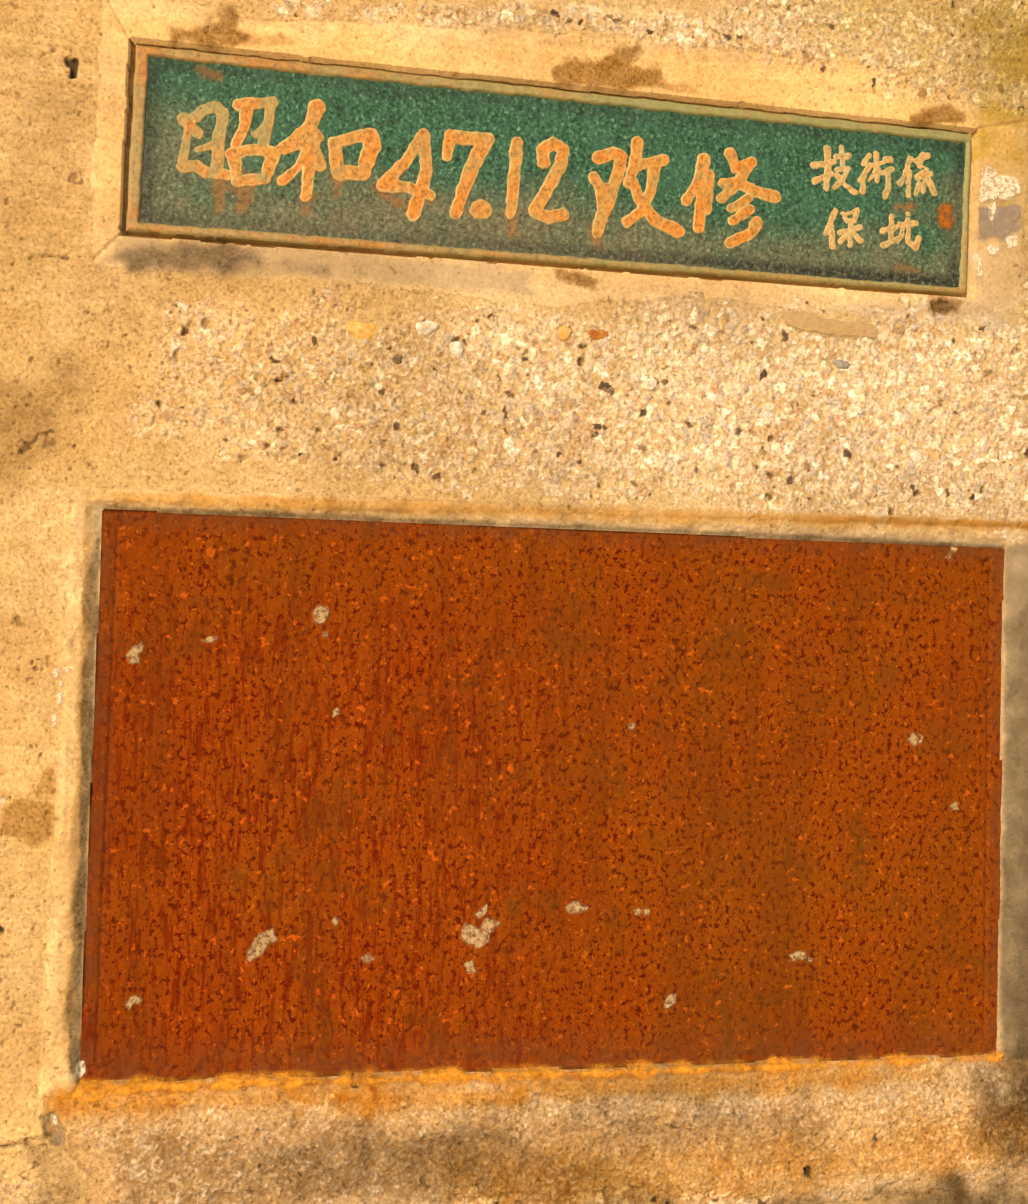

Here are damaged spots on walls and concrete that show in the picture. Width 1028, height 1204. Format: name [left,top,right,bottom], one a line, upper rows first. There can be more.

water stain [554,50,658,87]
rust [956,1053,1004,1062]
rust [57,1054,927,1103]